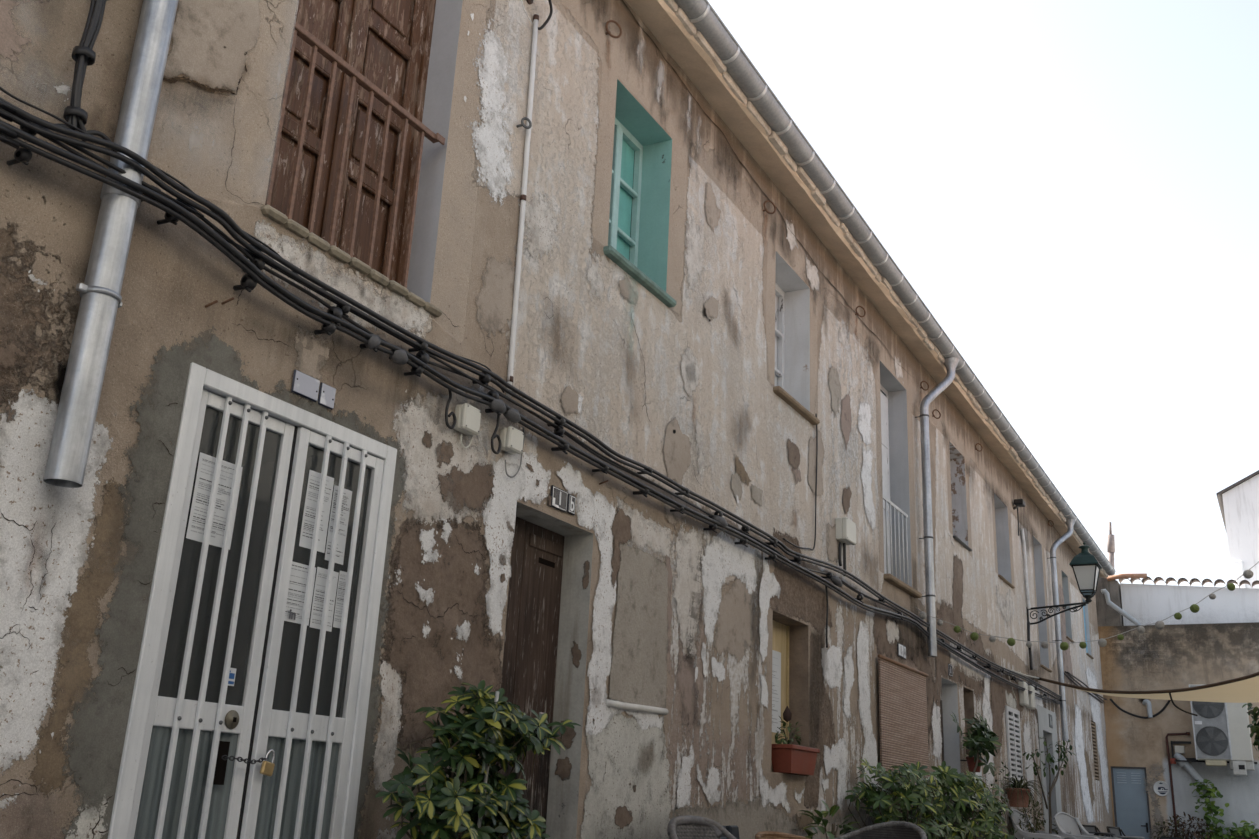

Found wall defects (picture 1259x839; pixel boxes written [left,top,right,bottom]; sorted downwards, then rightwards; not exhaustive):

crack [225,99,265,206]
peeling [464,13,522,206]
peeling [786,220,820,297]
flaking render [787,438,801,484]
crack [0,509,57,674]
peeling [0,364,126,808]
flaking render [373,389,664,792]
peeling [663,418,781,809]
flaking render [614,806,633,830]